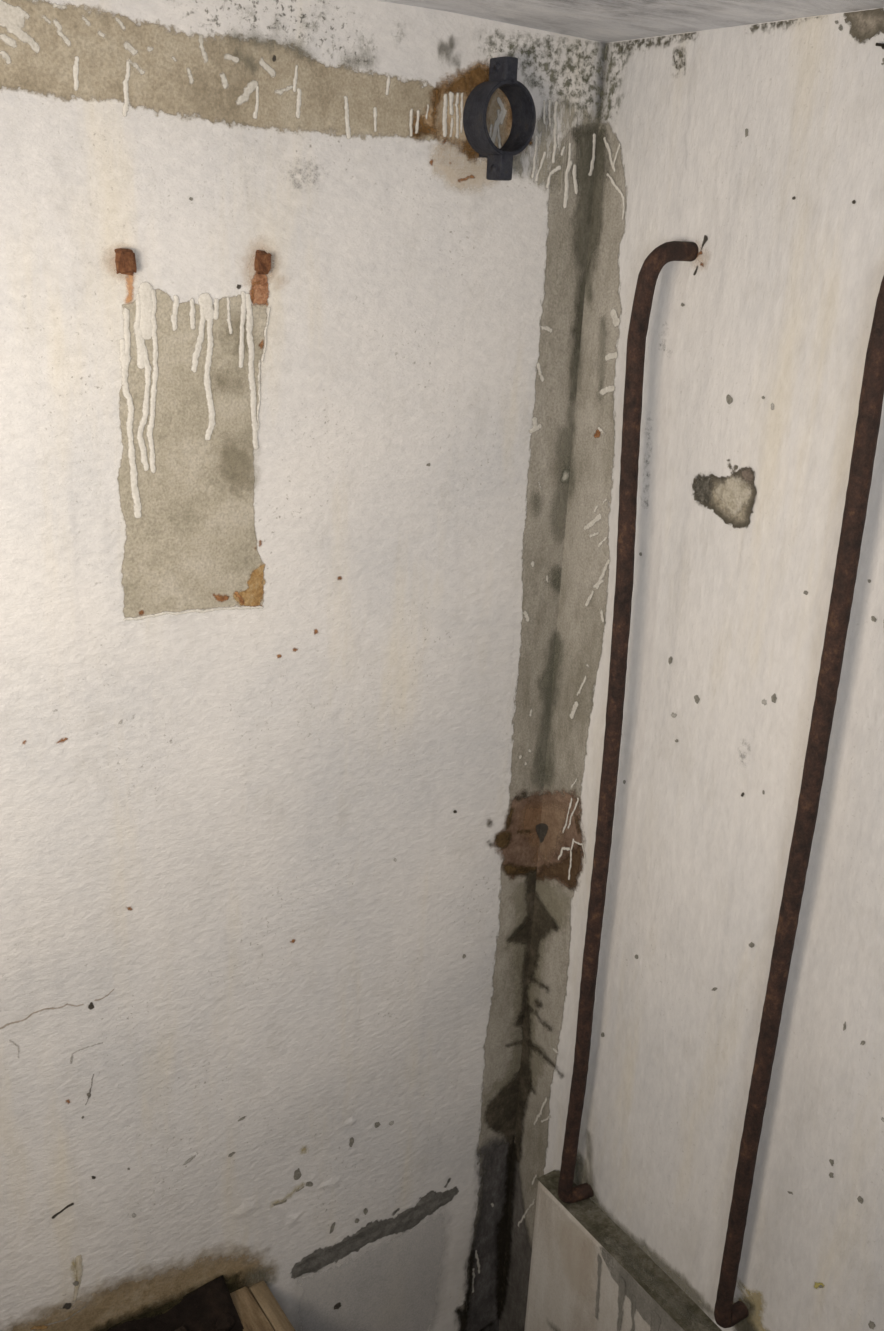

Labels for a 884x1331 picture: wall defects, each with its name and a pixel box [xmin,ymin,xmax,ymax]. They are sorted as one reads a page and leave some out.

peeling [0,0,450,142]
corrosion [412,62,512,188]
spalling [835,8,884,43]
corrosion [249,272,269,306]
peeling [117,282,270,620]
peeling [506,100,627,826]
spalling [692,460,757,529]
corrosion [488,778,586,889]
peeling [459,856,722,1331]
spalling [291,1178,459,1279]
water stain [11,1251,273,1331]
corrosion [734,1287,766,1331]